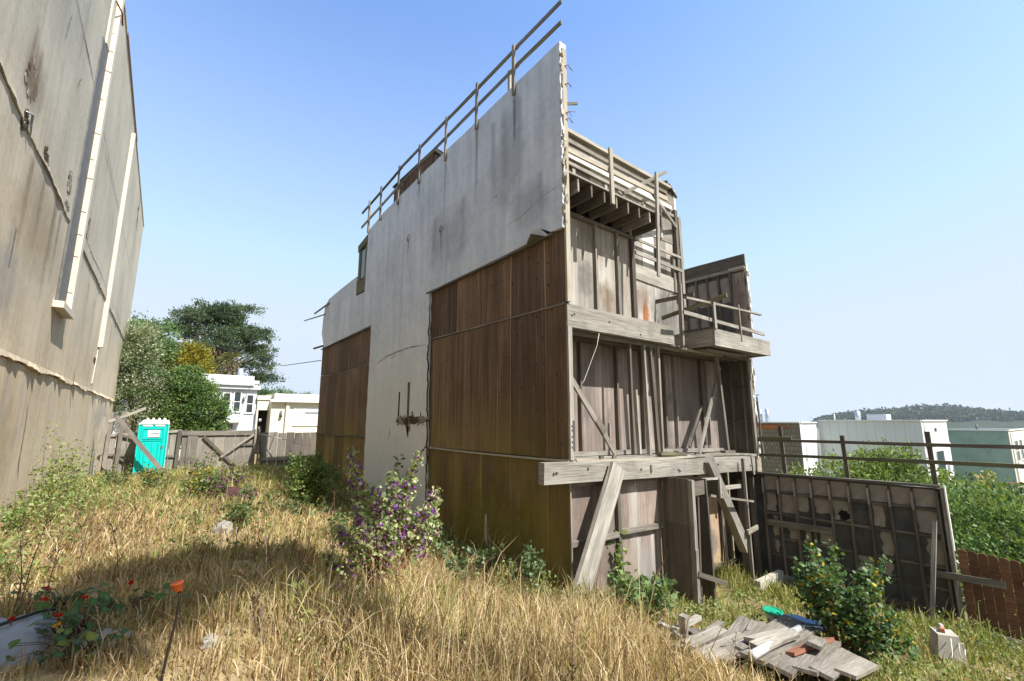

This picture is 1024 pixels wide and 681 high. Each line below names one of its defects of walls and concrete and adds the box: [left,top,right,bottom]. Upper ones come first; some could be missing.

flaking render [559,52,578,222]
crack [376,295,430,503]